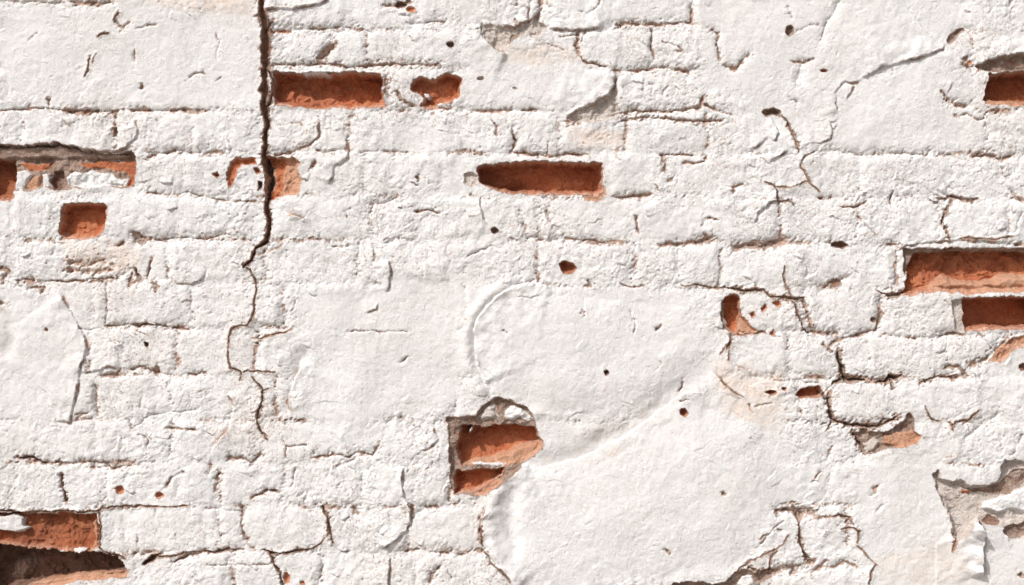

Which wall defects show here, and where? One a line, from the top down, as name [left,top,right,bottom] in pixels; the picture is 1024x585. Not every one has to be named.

spalling [272,71,386,146]
spalling [0,120,141,202]
crack [228,0,292,440]
spalling [464,161,606,234]
crack [765,121,819,204]
crack [694,266,806,332]
crack [882,291,902,299]
spalling [898,247,1024,363]
crack [816,352,957,451]
spalling [446,397,543,569]
spalling [0,511,129,585]
crack [738,514,876,582]